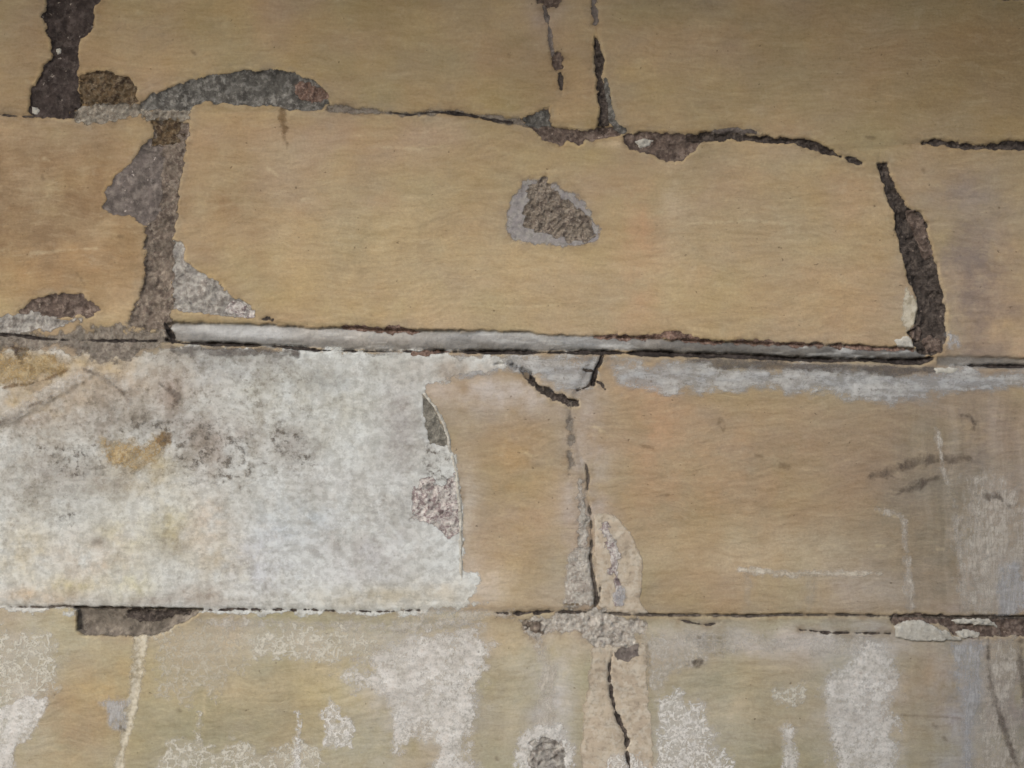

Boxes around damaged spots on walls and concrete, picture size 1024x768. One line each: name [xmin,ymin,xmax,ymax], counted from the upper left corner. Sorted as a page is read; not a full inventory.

spalling [73,69,329,126]
crack [326,105,531,127]
crack [921,138,1024,151]
spalling [506,177,601,248]
crack [685,127,946,356]
spalling [0,293,101,334]
spalling [594,331,914,352]
crack [496,352,892,635]
water stain [0,344,598,768]
peeling [894,618,997,642]
crack [580,644,653,768]
water stain [645,634,902,768]